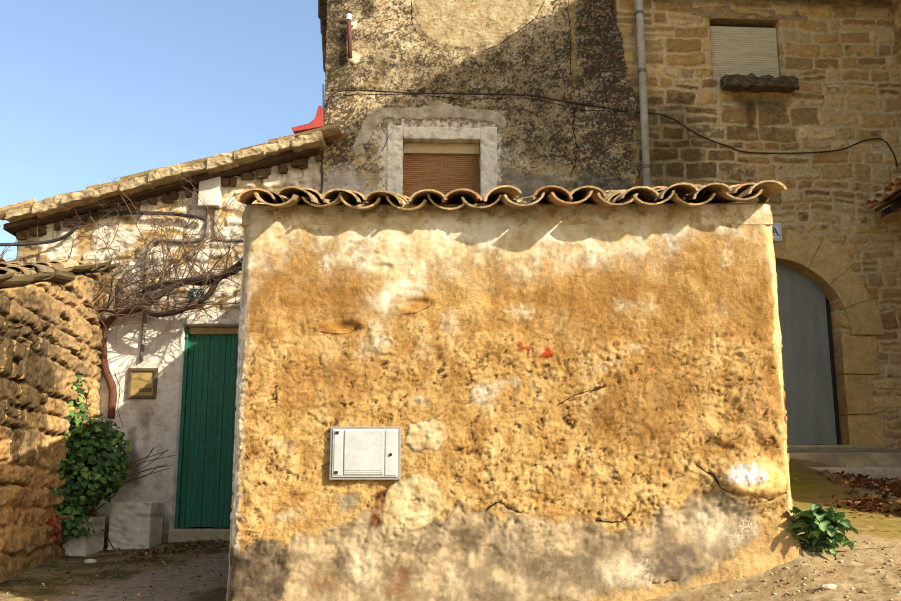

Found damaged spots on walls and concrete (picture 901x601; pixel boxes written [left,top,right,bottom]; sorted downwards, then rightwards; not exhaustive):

leakage [327,167,375,195]
leakage [505,171,632,202]
peeling [194,204,771,350]
leakage [227,538,291,601]
flaking render [282,491,757,601]